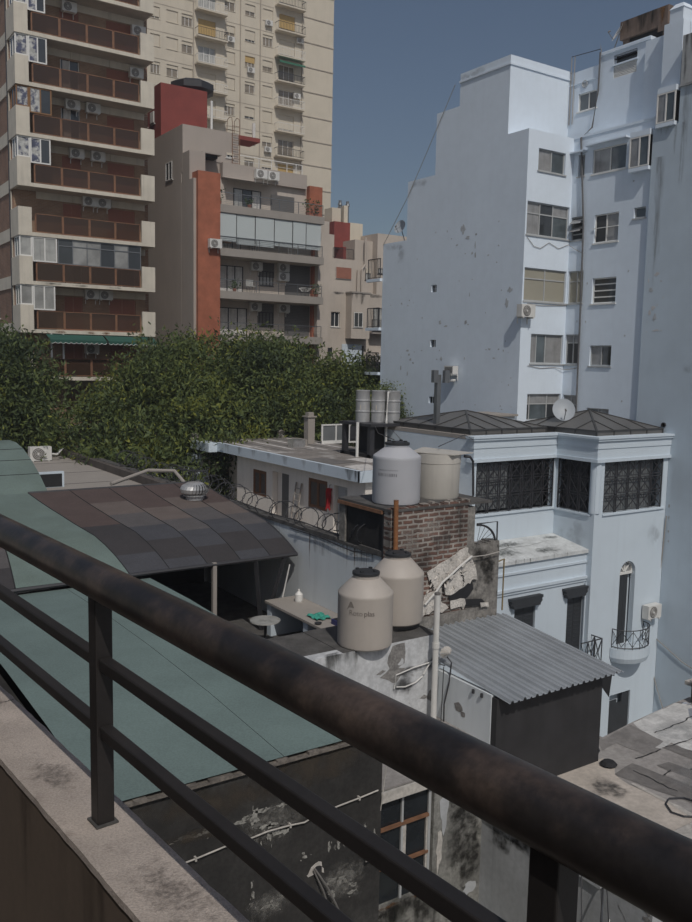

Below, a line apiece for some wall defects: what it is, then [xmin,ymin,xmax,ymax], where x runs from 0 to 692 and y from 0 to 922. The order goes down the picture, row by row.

peeling [423,547,477,616]
spalling [377,643,406,683]
peeling [234,803,291,848]
damp [451,808,479,879]
peeling [249,882,284,910]
peeling [300,852,358,897]